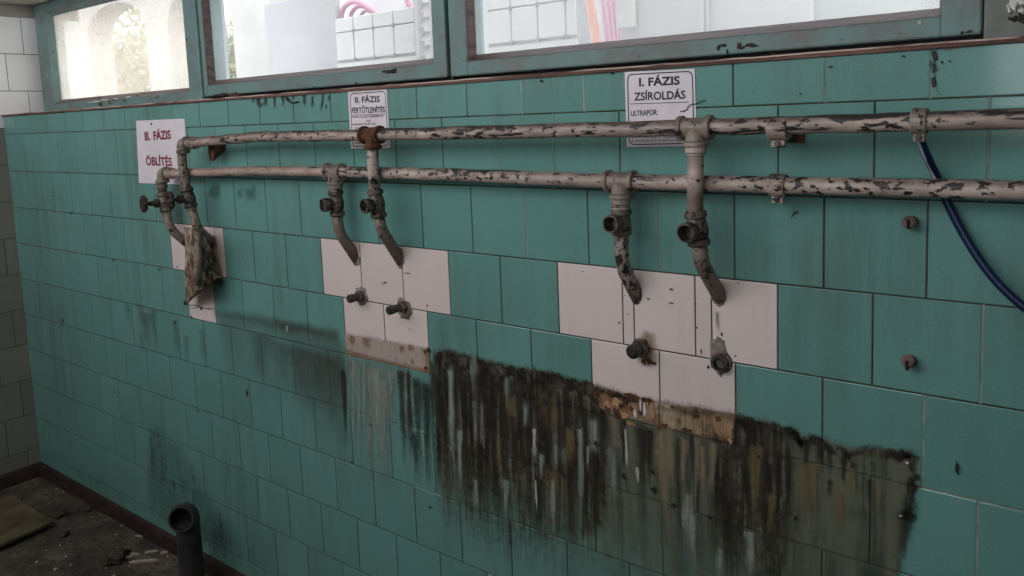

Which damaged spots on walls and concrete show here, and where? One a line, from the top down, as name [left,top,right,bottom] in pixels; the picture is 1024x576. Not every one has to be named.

leakage [341,350,920,576]